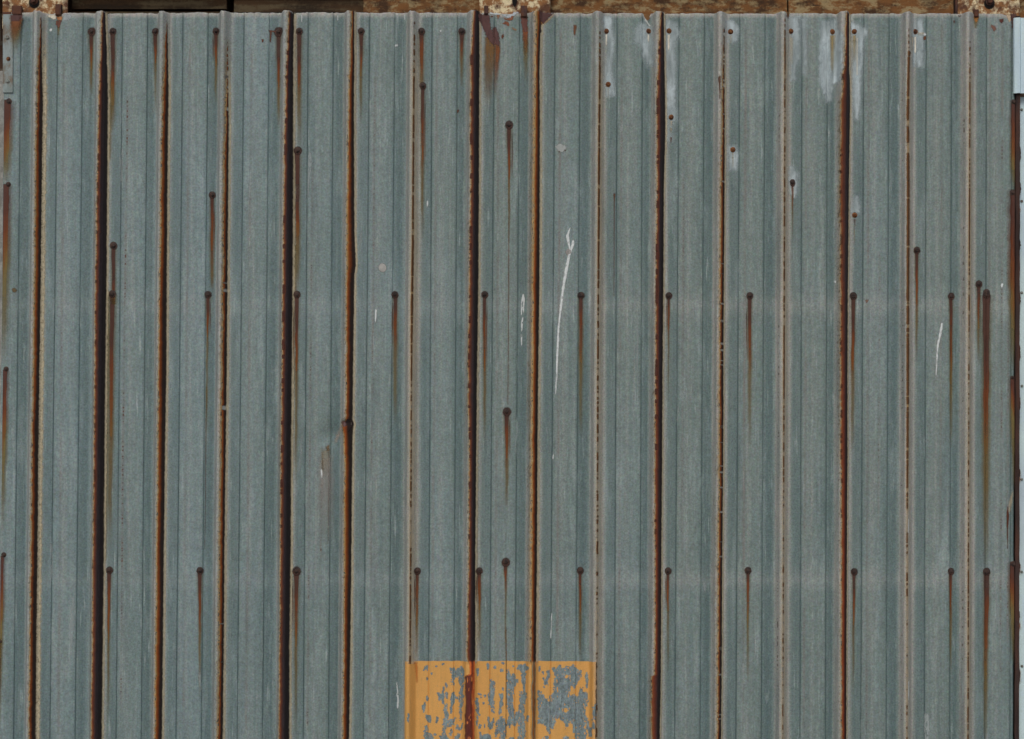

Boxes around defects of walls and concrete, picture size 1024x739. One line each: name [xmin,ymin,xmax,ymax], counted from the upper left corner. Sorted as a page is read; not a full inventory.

rust [28,18,47,739]
rust [88,12,126,739]
rust [152,25,171,739]
rust [205,28,231,739]
rust [261,12,329,739]
rust [342,10,365,739]
rust [457,10,554,739]
peeling [422,662,598,739]
rust [643,12,672,739]
rust [716,29,726,739]
rust [838,12,868,739]
rust [967,68,1021,739]